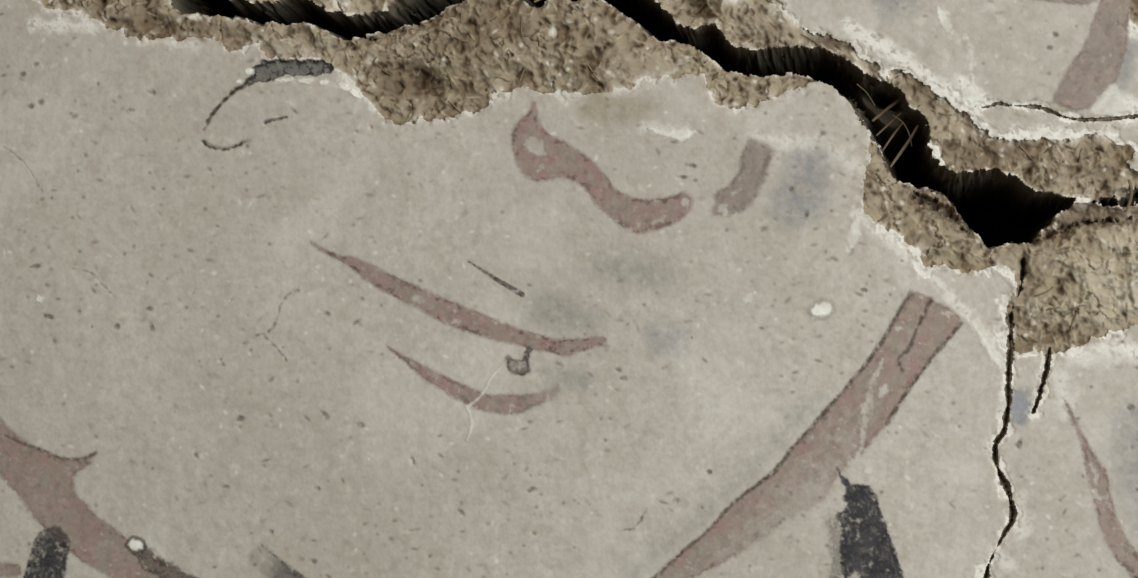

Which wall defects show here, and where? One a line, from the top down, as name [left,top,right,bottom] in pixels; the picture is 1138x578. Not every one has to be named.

crack [171,0,465,41]
spalling [40,0,817,125]
spalling [649,0,1138,356]
crack [523,0,1138,578]
spalling [972,320,1004,369]